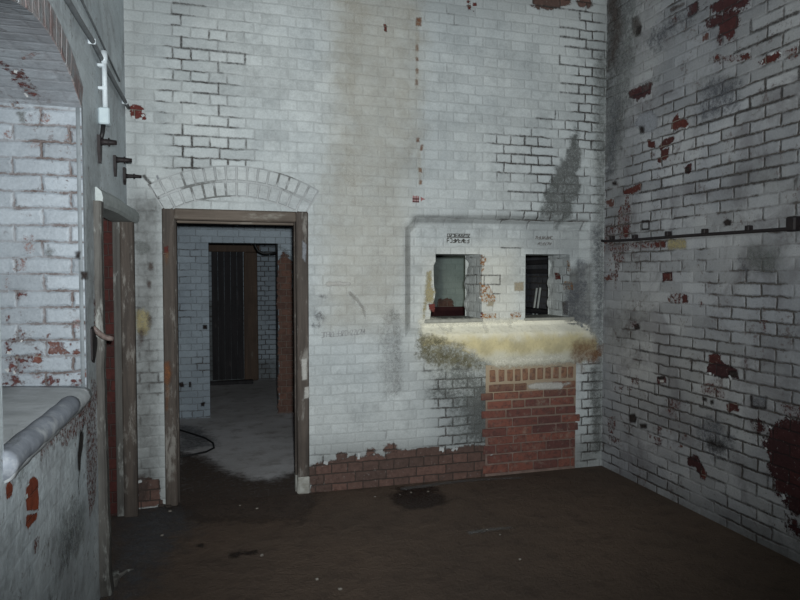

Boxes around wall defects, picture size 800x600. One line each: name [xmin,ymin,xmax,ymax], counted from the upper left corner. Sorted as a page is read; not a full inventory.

spalling [531,0,593,10]
spalling [671,0,749,45]
spalling [130,104,147,120]
spalling [640,113,689,163]
damp [542,135,581,217]
peeling [2,336,33,386]
damp [421,335,484,369]
spalling [701,353,739,412]
peeling [309,443,493,493]
spalling [687,454,707,479]
spalling [750,395,800,539]
peeling [24,477,39,528]